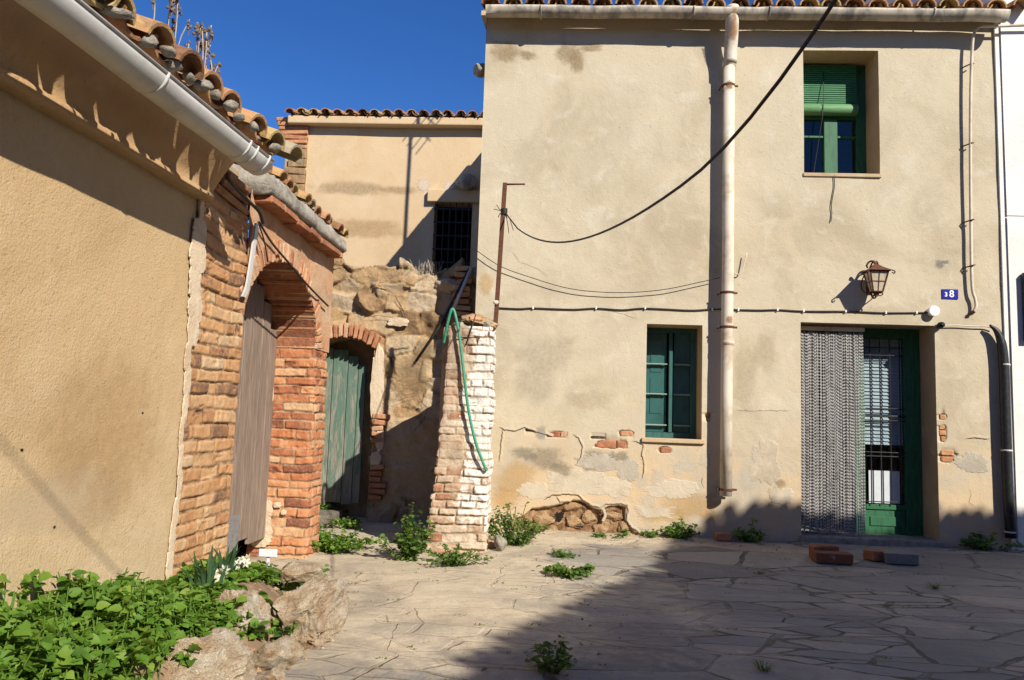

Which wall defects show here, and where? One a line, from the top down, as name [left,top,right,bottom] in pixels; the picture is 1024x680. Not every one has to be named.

crack [499,424,585,463]
peeling [515,430,699,519]
crack [632,438,647,480]
peeling [938,414,989,473]